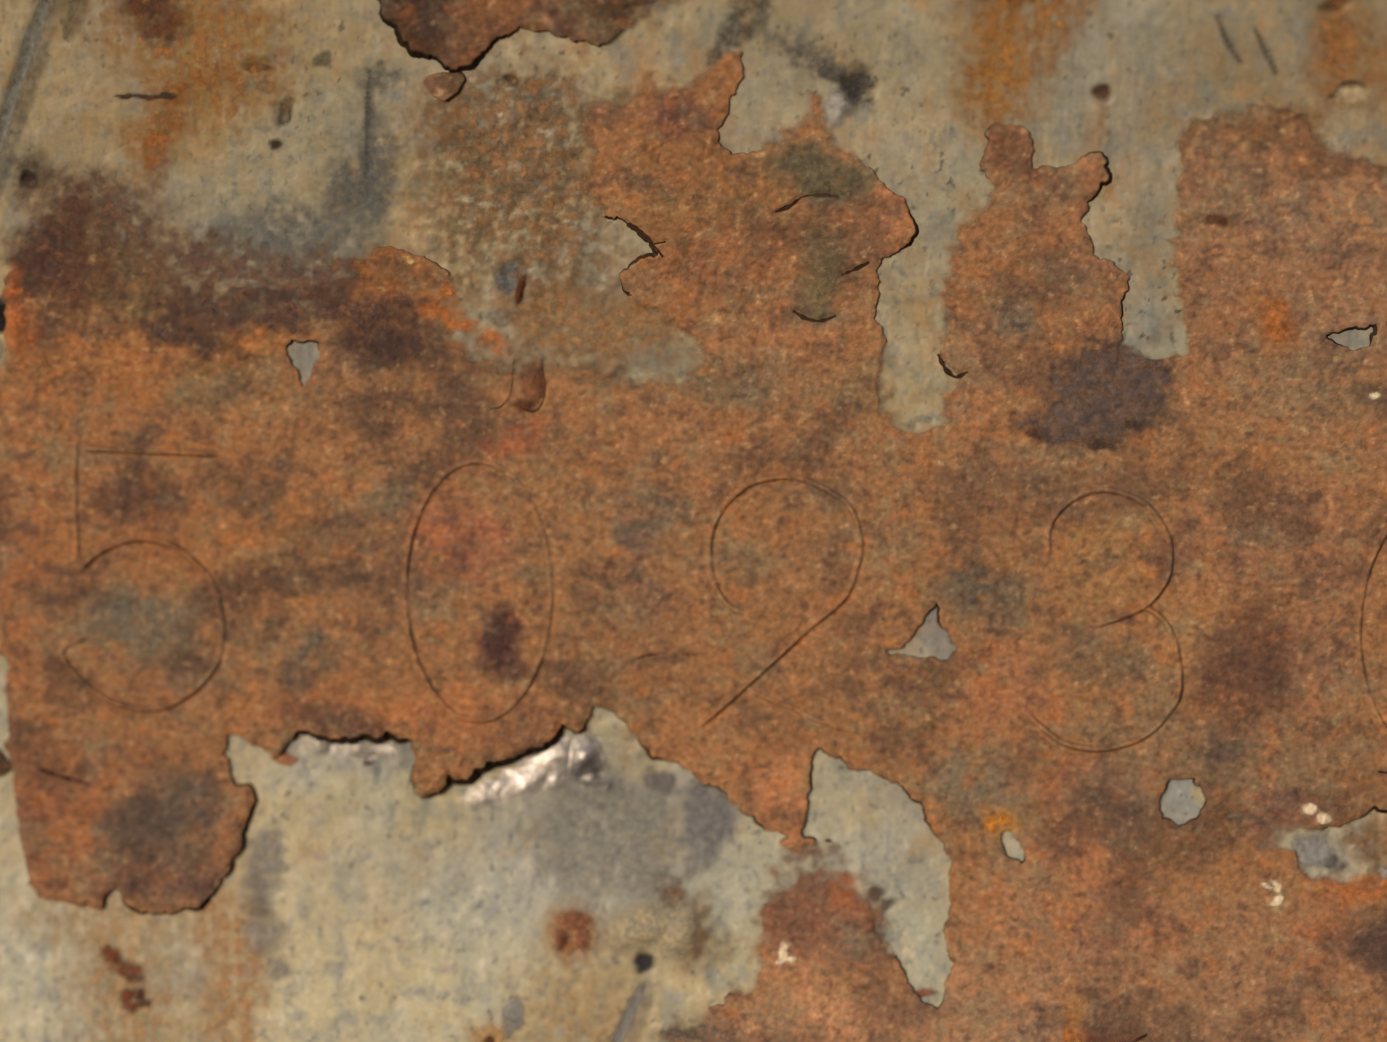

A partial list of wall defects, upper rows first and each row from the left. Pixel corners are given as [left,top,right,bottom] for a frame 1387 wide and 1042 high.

rust [121,0,285,169]
rust [378,0,656,306]
rust [71,443,80,559]
rust [83,445,218,458]
rust [58,535,226,713]
rust [402,457,554,724]
rust [698,473,864,736]
rust [1019,486,1184,753]
rust [1355,527,1387,737]
rust [0,750,11,777]
rust [83,917,172,1042]
rust [549,911,598,958]